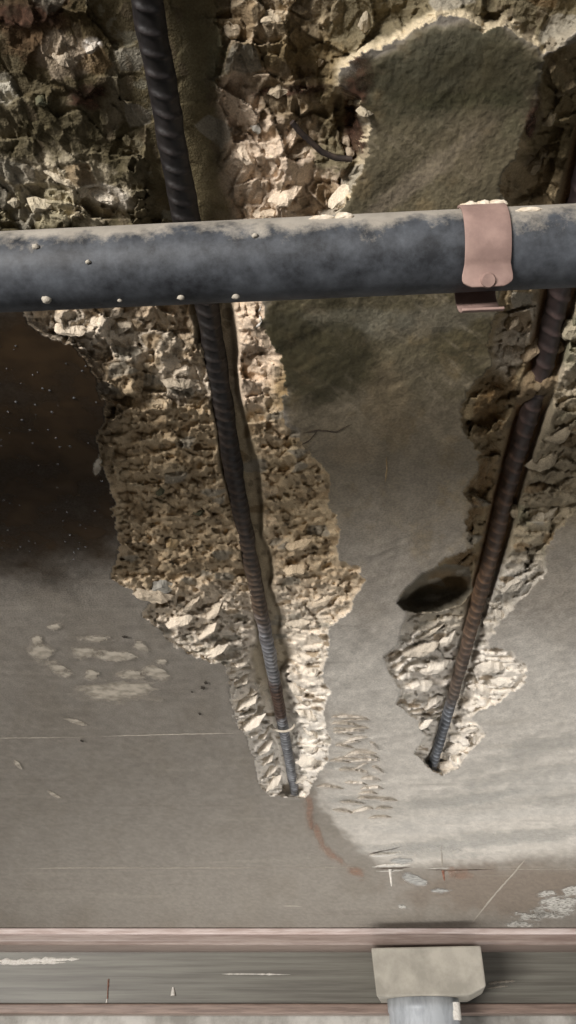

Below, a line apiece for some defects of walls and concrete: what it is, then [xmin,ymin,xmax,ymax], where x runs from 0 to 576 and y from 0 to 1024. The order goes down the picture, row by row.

spalling [0,0,576,231]
water stain [28,624,71,678]
water stain [74,636,170,702]
spalling [24,301,366,798]
spalling [384,288,576,776]